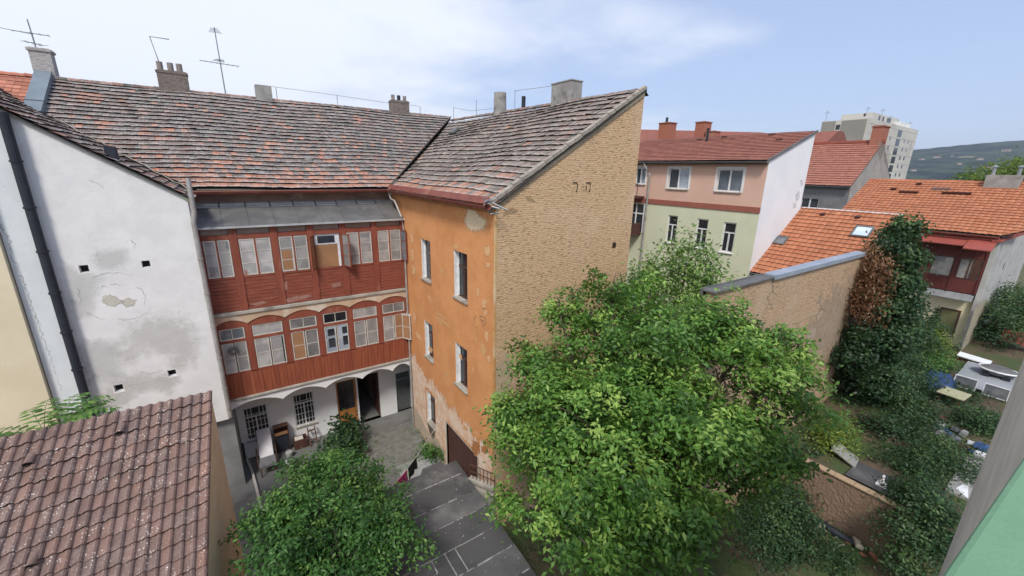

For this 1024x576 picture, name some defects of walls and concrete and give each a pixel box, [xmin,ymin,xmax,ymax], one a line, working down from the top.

peeling [463,209,487,232]
peeling [102,294,136,307]
flaking render [411,353,492,484]